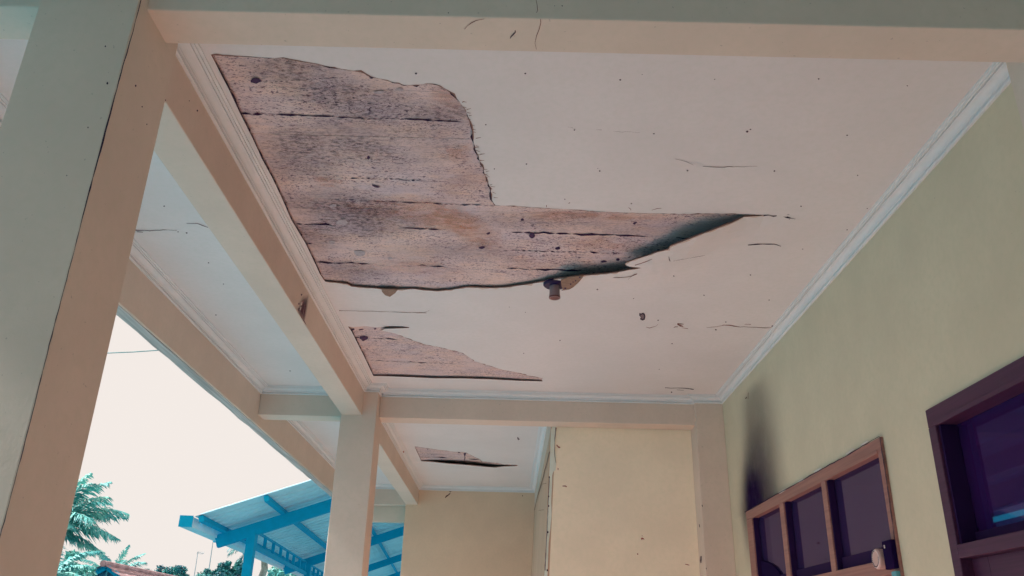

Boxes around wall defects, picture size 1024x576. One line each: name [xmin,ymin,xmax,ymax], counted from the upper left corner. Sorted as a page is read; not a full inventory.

peeling [212,54,764,297]
peeling [350,326,542,381]
peeling [415,447,514,467]